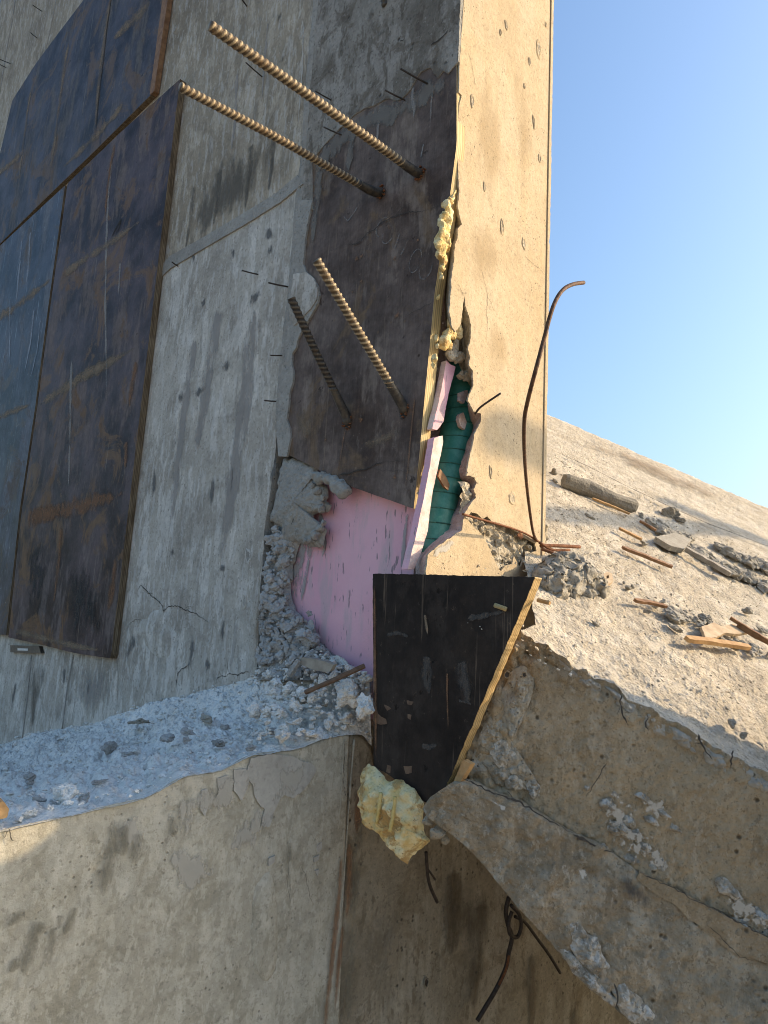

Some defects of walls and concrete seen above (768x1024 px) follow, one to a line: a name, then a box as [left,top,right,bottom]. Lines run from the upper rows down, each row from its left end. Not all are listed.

peeling [270,200,332,548]
crack [464,779,613,853]
spalling [599,791,682,871]
crack [642,873,767,960]
spalling [715,877,768,936]
spalling [558,922,655,1024]